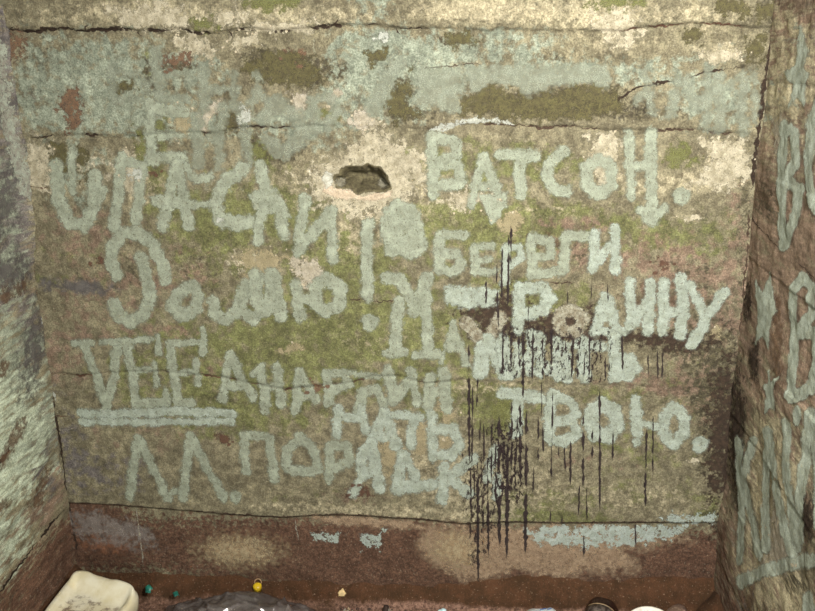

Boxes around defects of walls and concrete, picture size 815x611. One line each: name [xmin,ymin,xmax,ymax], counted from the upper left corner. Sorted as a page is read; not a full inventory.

crack [9,25,253,38]
crack [275,18,431,34]
crack [619,22,741,32]
rust [53,83,85,136]
crack [425,122,732,135]
crack [618,66,742,101]
crack [751,16,773,190]
spalling [305,107,429,222]
crack [739,213,779,331]
damp [447,228,761,582]